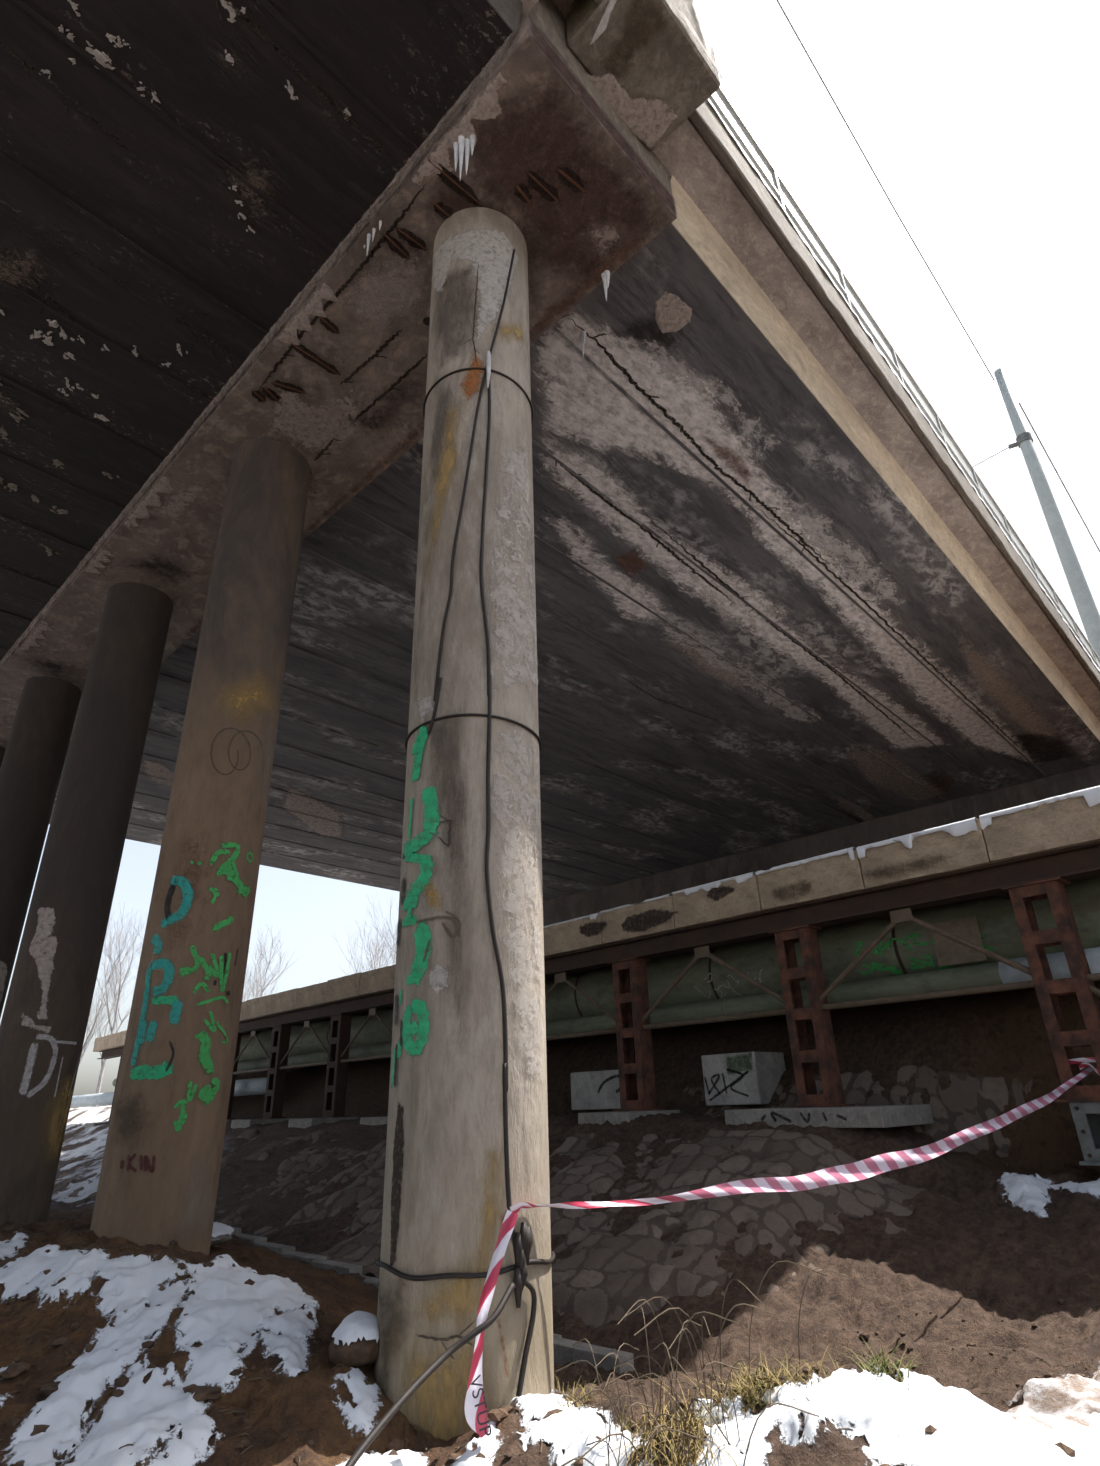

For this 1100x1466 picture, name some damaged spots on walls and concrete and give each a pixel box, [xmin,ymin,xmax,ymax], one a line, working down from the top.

peeling [58,0,131,70]
peeling [217,49,241,69]
peeling [220,0,246,23]
rust [430,89,656,333]
spalling [655,291,692,333]
rust [461,356,483,398]
damp [501,312,1060,802]
crack [555,318,1030,764]